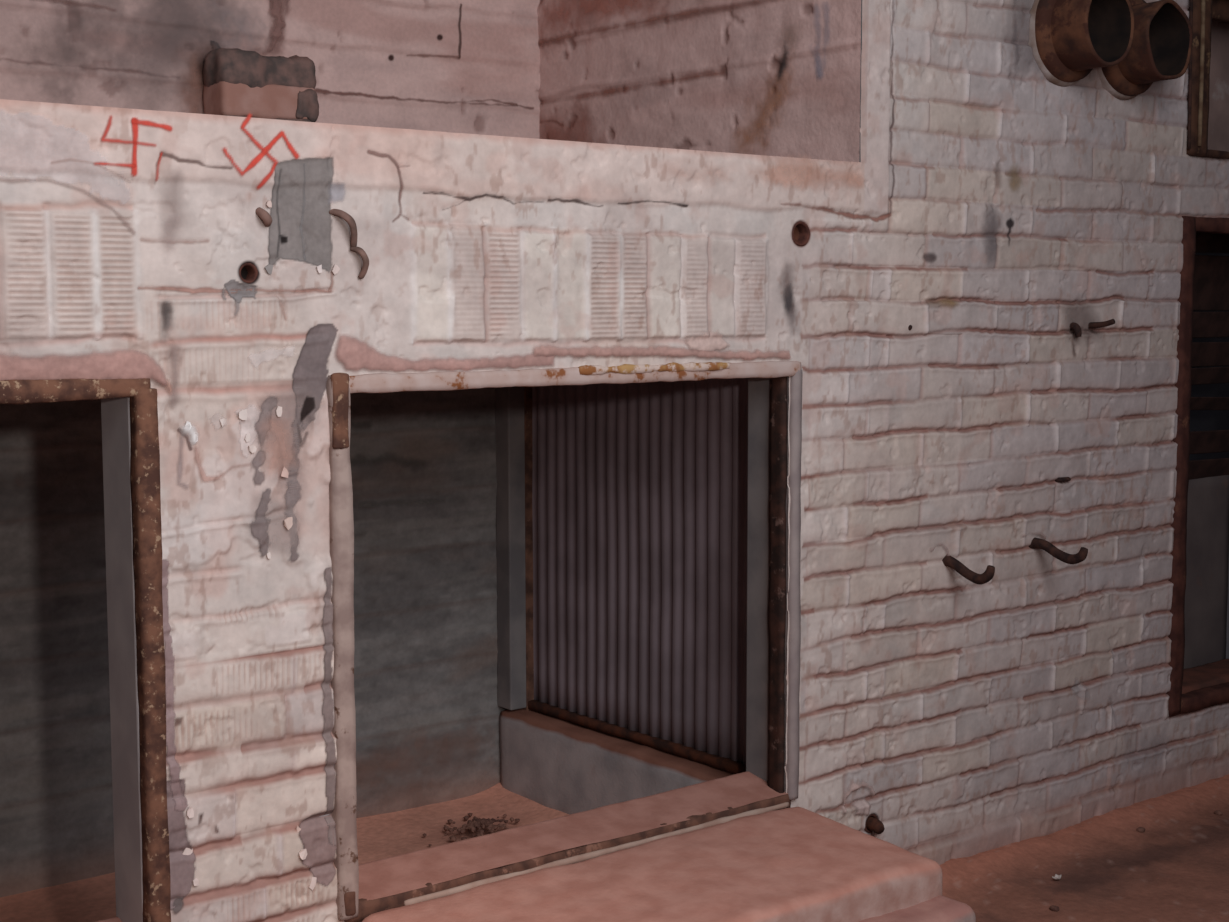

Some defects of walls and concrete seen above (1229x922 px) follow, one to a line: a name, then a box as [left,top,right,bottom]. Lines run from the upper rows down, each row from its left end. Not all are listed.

crack [368,150,407,220]
crack [434,193,509,201]
crack [548,197,588,205]
corrosion [578,362,730,375]
spalling [211,324,338,561]
spalling [296,567,337,890]